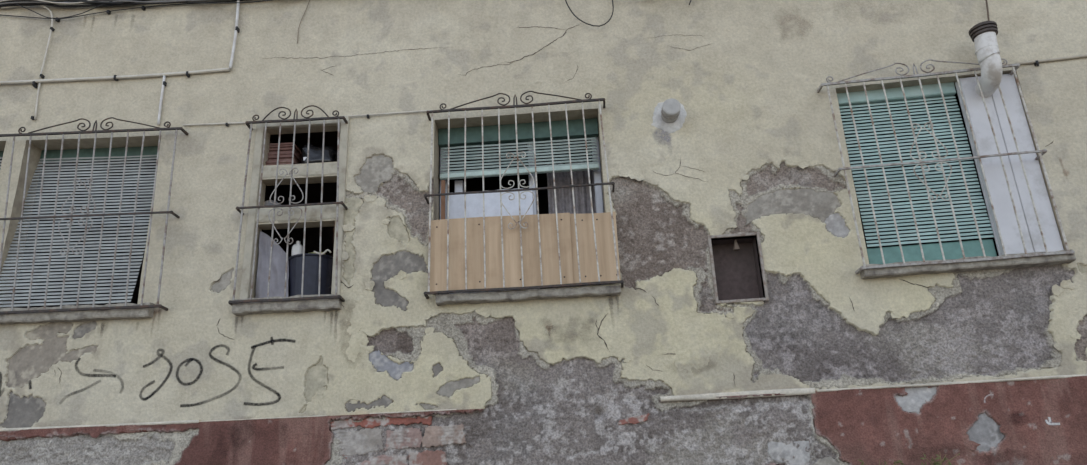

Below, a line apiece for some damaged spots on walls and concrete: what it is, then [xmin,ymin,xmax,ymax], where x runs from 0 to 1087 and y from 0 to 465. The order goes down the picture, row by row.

crack [466,23,581,74]
spalling [325,154,1087,465]
spalling [0,321,199,465]
peeling [299,357,329,413]